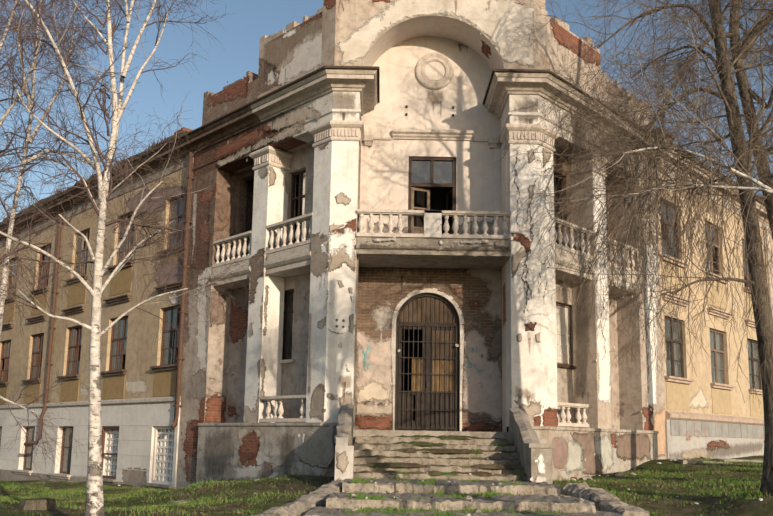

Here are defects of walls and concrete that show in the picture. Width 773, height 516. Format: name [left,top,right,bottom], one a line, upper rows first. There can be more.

flaking render [268,0,336,41]
flaking render [550,20,603,68]
flaking render [207,58,286,107]
crack [512,148,554,314]
flaking render [209,246,270,344]
flaking render [317,313,355,334]
flaking render [183,358,273,486]
flaking render [309,383,361,421]
flaking render [355,402,393,430]
flaking render [463,419,502,432]
flaking render [570,432,604,476]
flaking render [706,440,730,452]